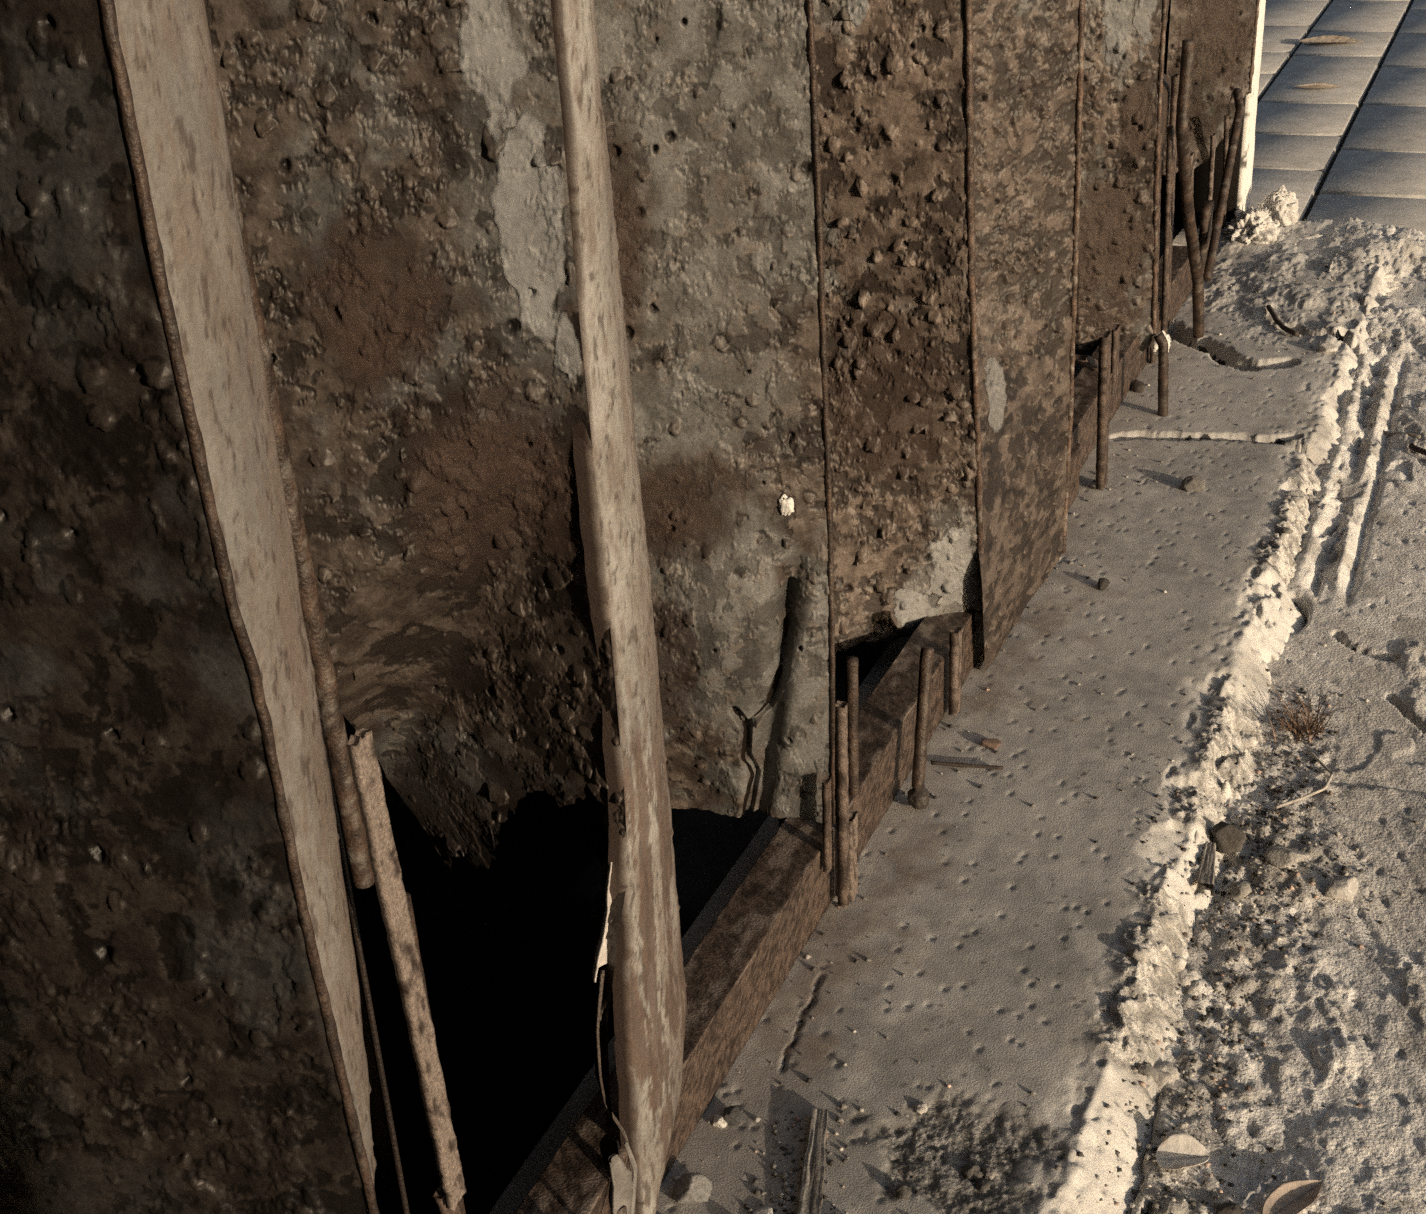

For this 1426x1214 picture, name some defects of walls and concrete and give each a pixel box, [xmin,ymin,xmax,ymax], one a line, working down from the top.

corrosion [1169,0,1257,163]